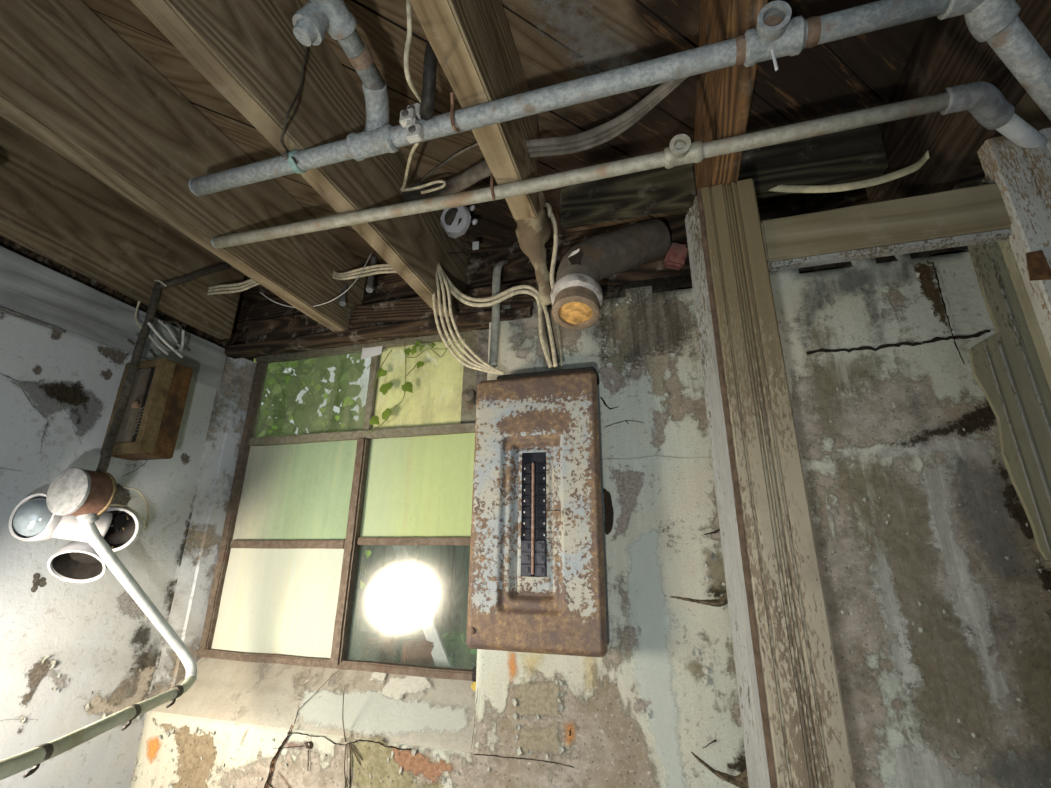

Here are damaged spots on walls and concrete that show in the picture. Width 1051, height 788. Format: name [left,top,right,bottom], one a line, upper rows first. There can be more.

crack [806,263,991,364]
peeling [97,344,133,380]
spalling [109,483,131,508]
flaking render [603,465,645,541]
damp [952,459,1051,596]
peeling [115,590,147,620]
flaking render [703,549,726,589]
damp [836,458,996,750]
flaking render [17,655,156,733]
flaking render [152,718,233,788]
crack [264,659,413,788]
spalling [369,743,458,785]